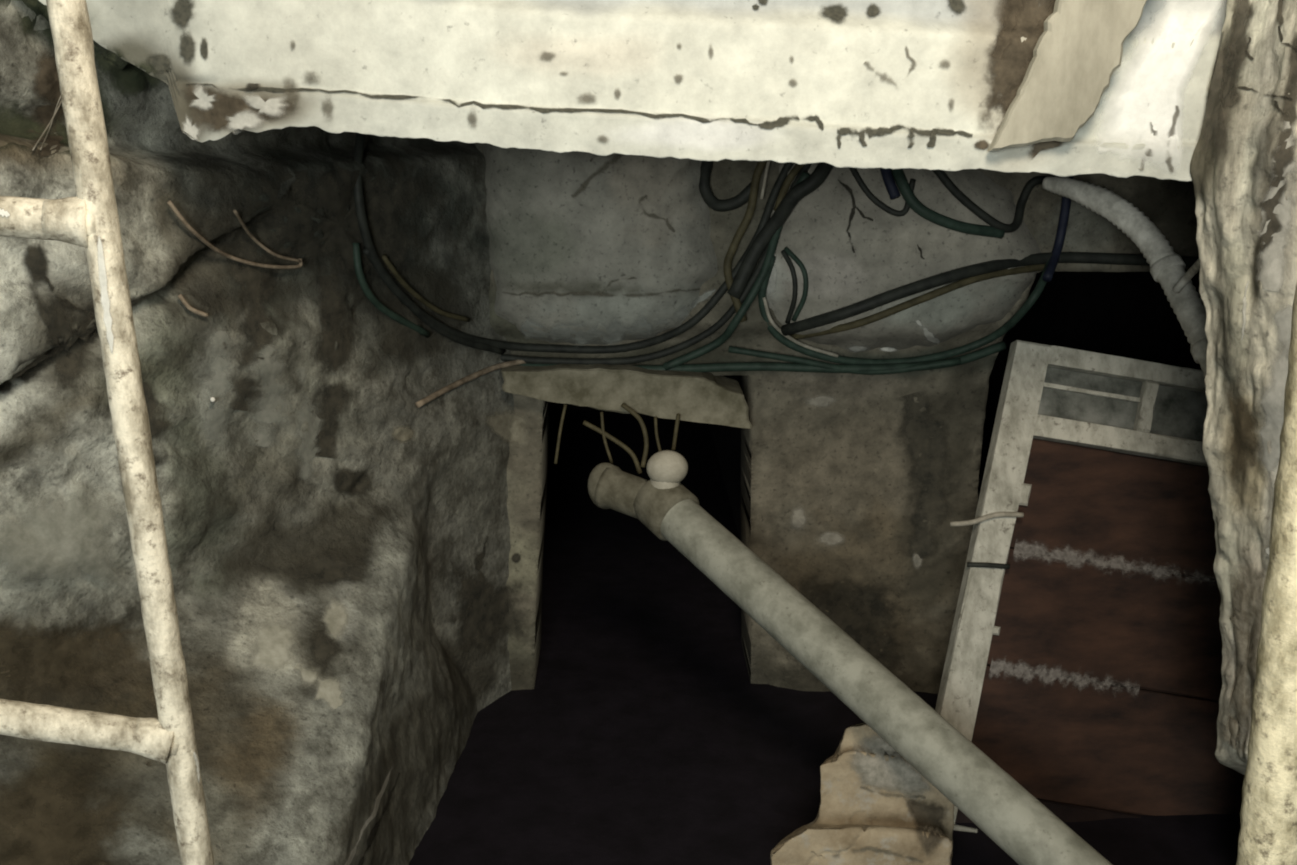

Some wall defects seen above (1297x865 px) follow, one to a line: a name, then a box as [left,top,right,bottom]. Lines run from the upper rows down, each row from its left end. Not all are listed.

spalling [182,83,288,140]
crack [186,75,764,125]
leakage [983,0,1056,129]
peeling [1102,0,1221,171]
leakage [1203,0,1253,149]
leakage [1241,35,1297,340]
crack [0,277,99,392]
leakage [36,296,97,387]
leakage [142,382,169,465]
leakage [1228,305,1292,479]
leakage [0,623,130,690]
leakage [0,777,125,865]